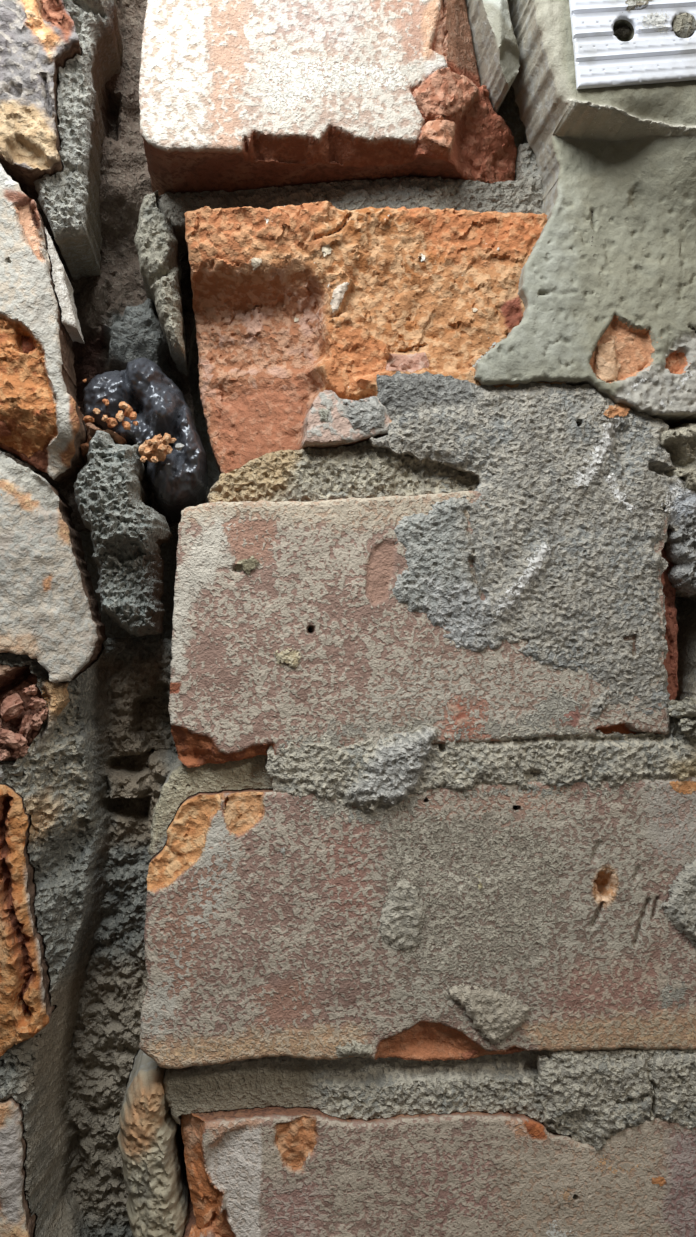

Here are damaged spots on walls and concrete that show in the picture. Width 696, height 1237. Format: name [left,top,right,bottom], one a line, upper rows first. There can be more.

spalling [410,56,516,183]
flaking render [556,99,696,144]
spalling [589,315,692,383]
spalling [603,403,630,418]
spalling [171,726,273,767]
spalling [147,792,264,891]
crack [0,797,34,1016]
spalling [375,1022,522,1060]
spalling [181,1113,222,1237]
spalling [273,1117,317,1175]